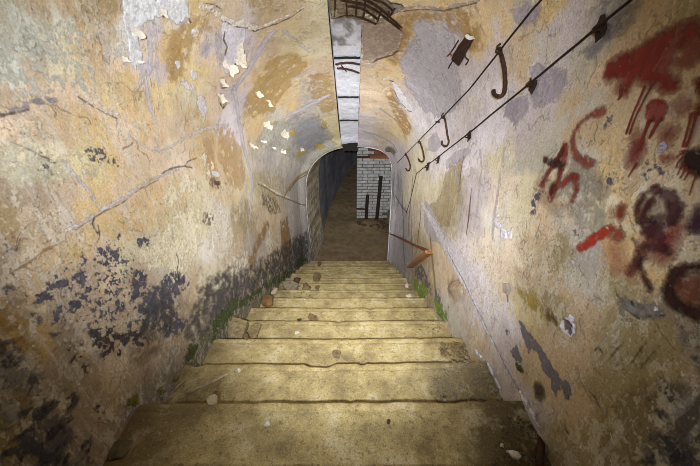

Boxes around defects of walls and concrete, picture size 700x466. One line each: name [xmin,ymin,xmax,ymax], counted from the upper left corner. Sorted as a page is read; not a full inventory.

crack [0,98,57,117]
peeling [0,21,101,104]
peeling [95,0,196,76]
peeling [180,69,207,120]
peeling [218,18,248,109]
crack [42,93,228,240]
water stain [25,23,335,360]
flaking render [510,320,571,400]
spalling [559,314,575,337]